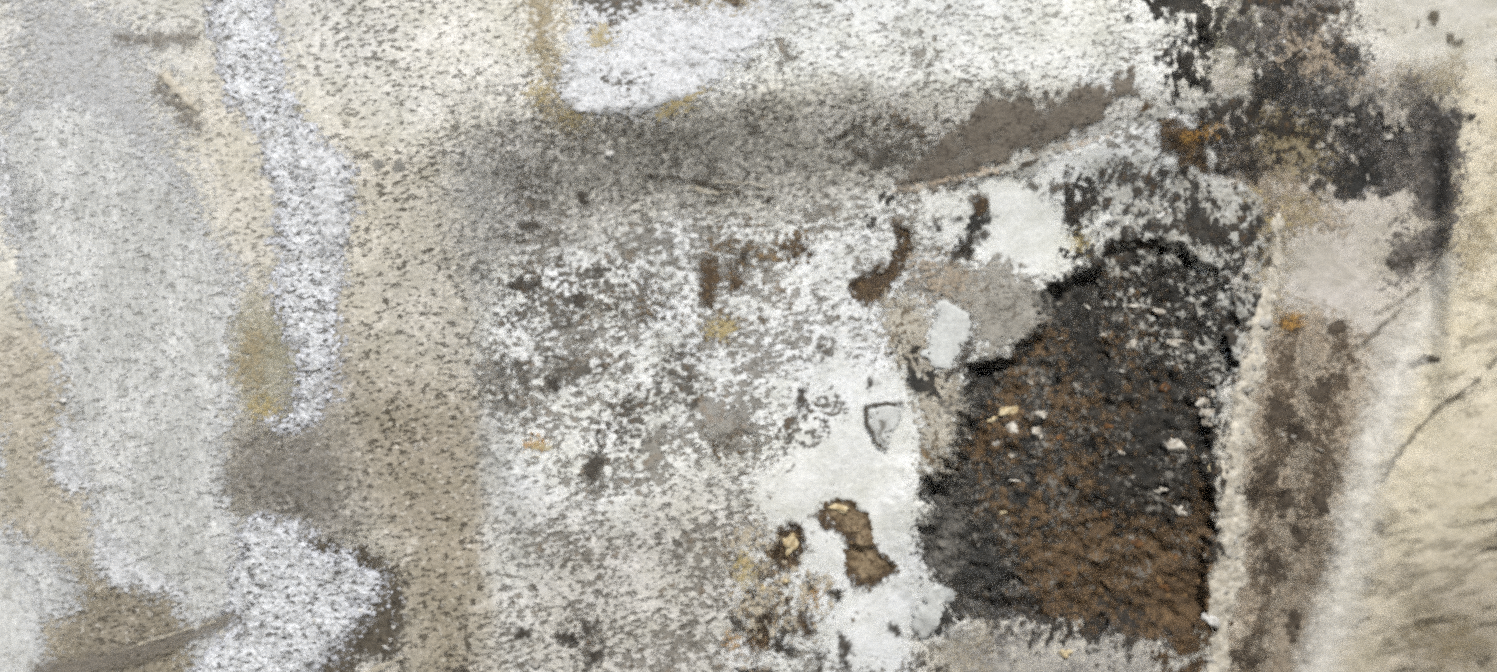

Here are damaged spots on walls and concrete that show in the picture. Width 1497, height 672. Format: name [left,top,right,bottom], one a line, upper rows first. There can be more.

mould [1119,0,1487,303]
peeling [470,210,815,495]
spalling [702,98,1278,672]
spalling [515,627,532,638]
peeling [529,607,609,672]